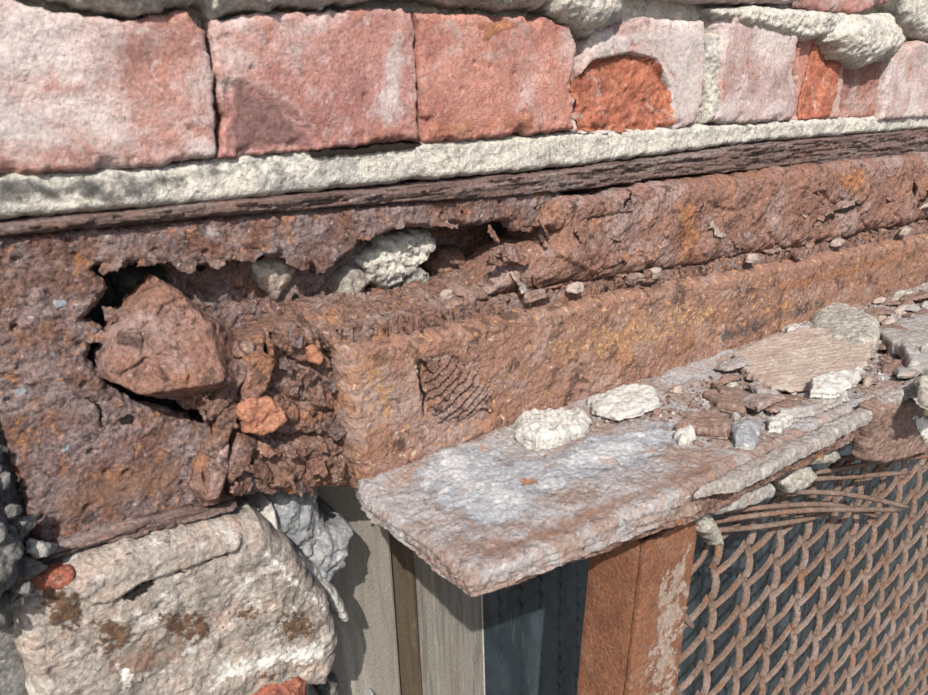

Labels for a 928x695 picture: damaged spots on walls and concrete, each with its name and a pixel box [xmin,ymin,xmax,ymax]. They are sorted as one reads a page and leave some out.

corrosion [438,152,928,309]
spalling [304,344,324,366]
corrosion [422,353,496,423]
spalling [119,413,134,425]
corrosion [199,350,277,500]
spalling [236,393,287,436]
corrosion [504,289,928,588]
spalling [729,412,793,450]
peeling [773,450,841,493]
spalling [694,513,724,546]
peeling [644,545,691,695]